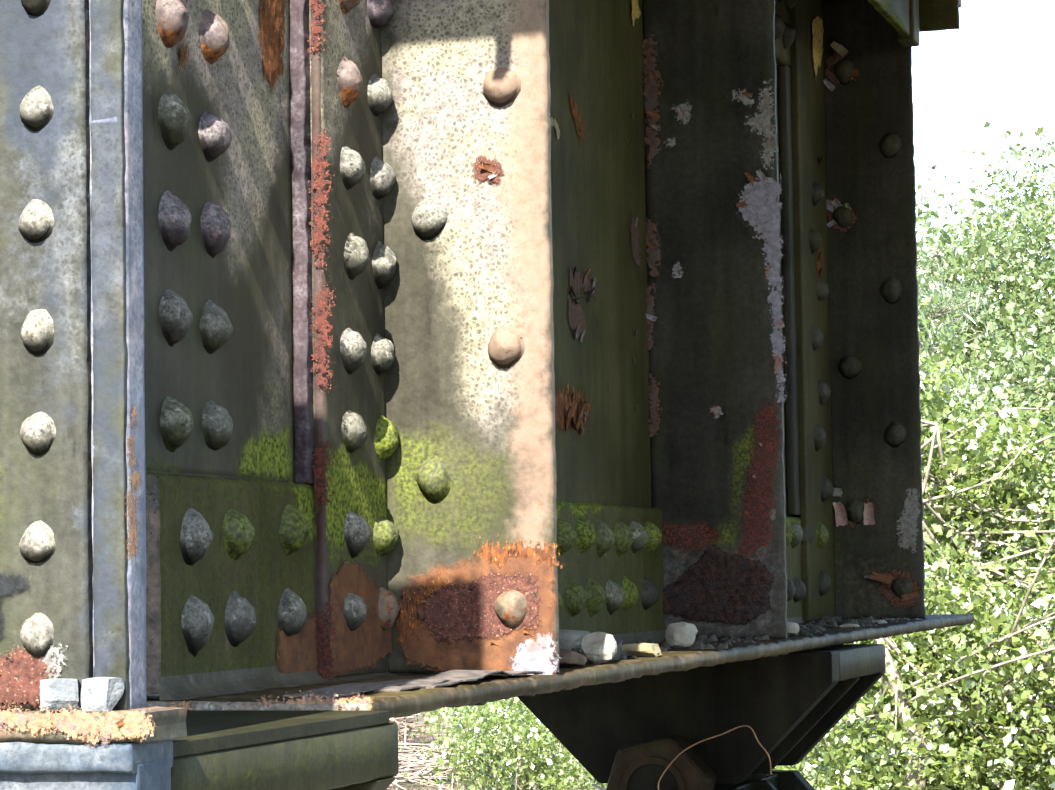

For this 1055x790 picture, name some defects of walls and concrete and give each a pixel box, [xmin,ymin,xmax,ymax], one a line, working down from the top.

rust [258,0,285,92]
rust [307,0,329,57]
rust [472,155,505,184]
rust [308,127,337,392]
peeling [568,265,598,342]
peeling [730,79,787,406]
rust [124,405,142,561]
rust [310,440,335,513]
rust [662,397,784,626]
leakage [0,574,28,639]
rust [253,535,563,710]
rust [0,646,154,748]